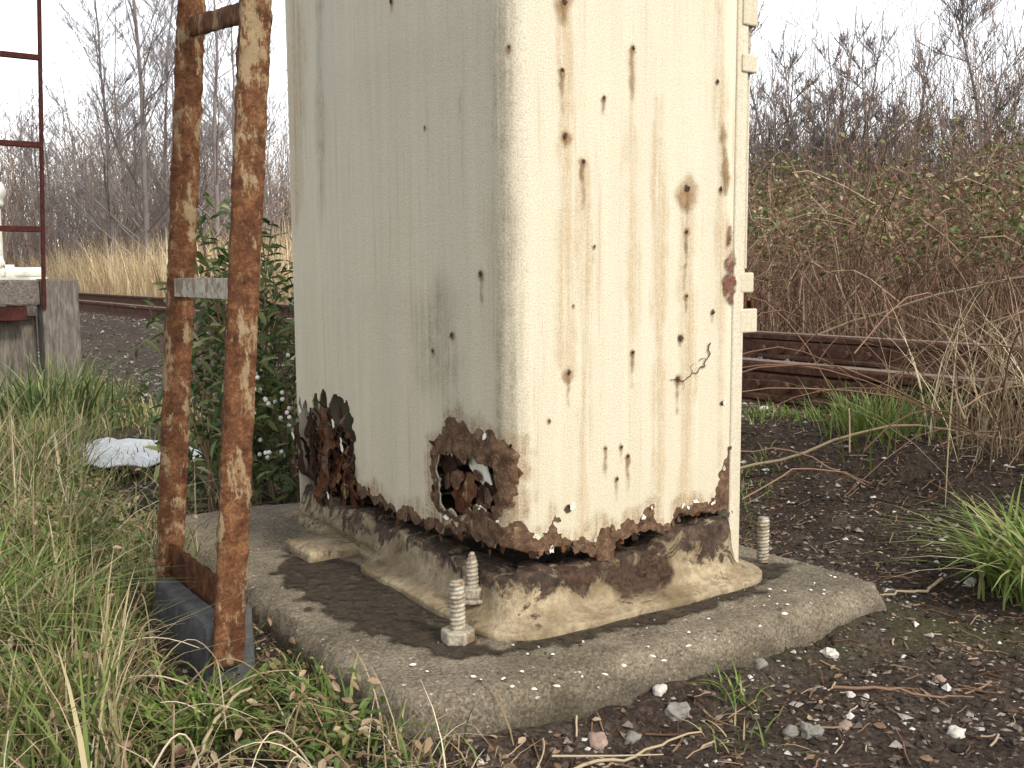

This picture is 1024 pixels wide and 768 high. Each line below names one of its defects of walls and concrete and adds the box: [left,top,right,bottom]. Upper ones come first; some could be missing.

leakage [269,553,803,658]